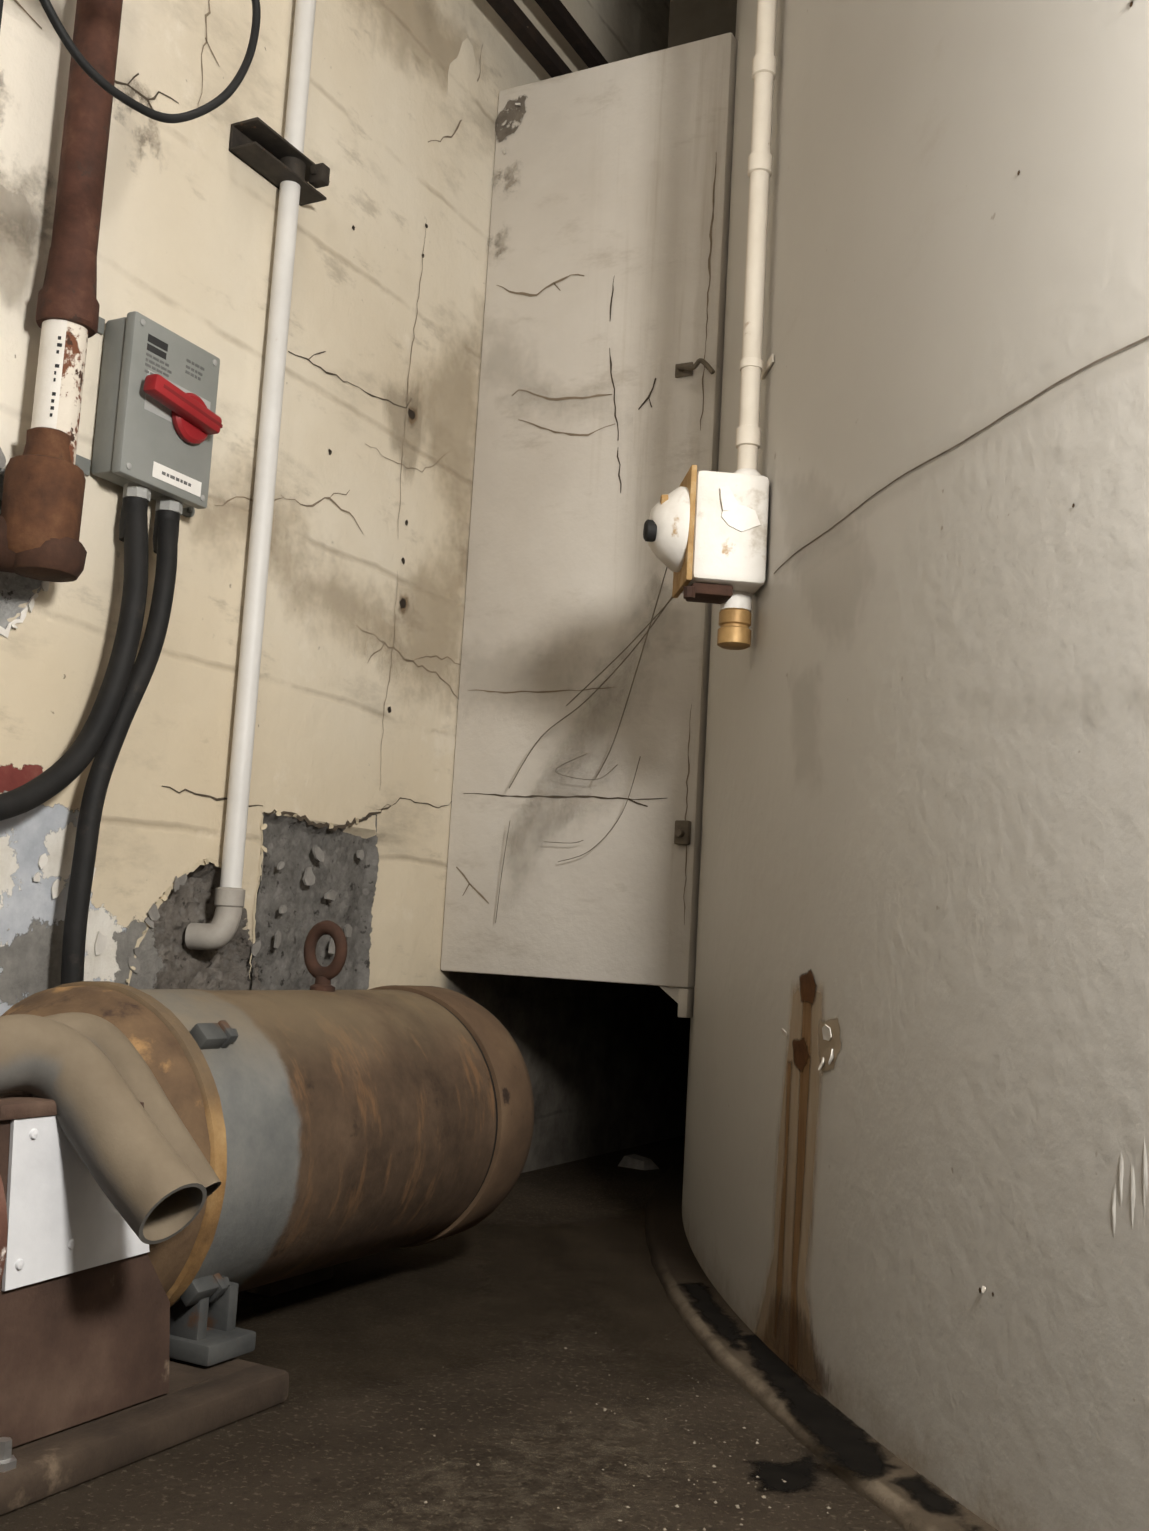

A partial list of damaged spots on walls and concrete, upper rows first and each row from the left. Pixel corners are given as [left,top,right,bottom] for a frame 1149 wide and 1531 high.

crack [115,0,220,110]
leakage [0,182,40,242]
spalling [0,448,8,514]
spalling [0,572,49,638]
peeling [0,763,43,793]
crack [162,786,263,807]
peeling [0,804,79,1016]
spalling [84,806,391,990]
corrosion [757,970,824,1393]